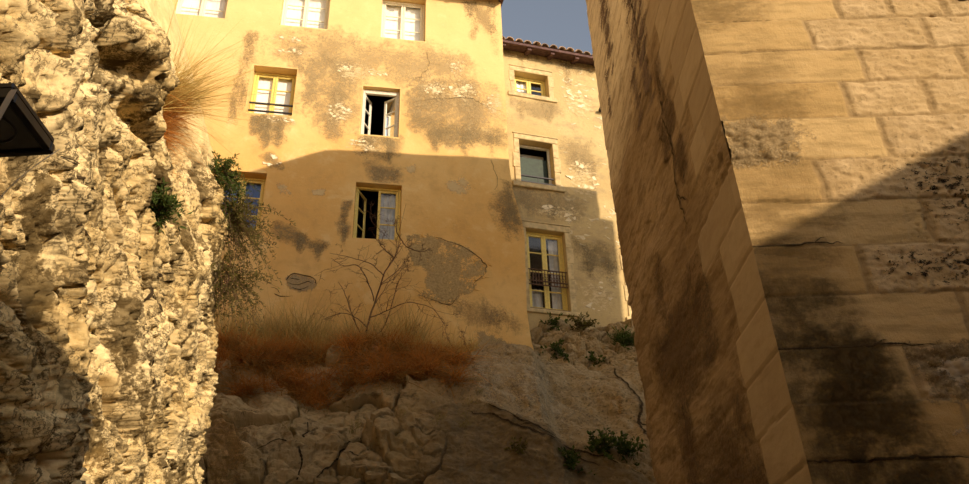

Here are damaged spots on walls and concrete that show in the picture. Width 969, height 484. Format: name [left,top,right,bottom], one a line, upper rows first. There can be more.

damp [287,34,503,150]
flaking render [285,273,318,292]
flaking render [406,233,491,306]
damp [493,182,584,232]
spalling [531,0,816,484]
crack [753,237,841,247]
damp [763,280,955,484]